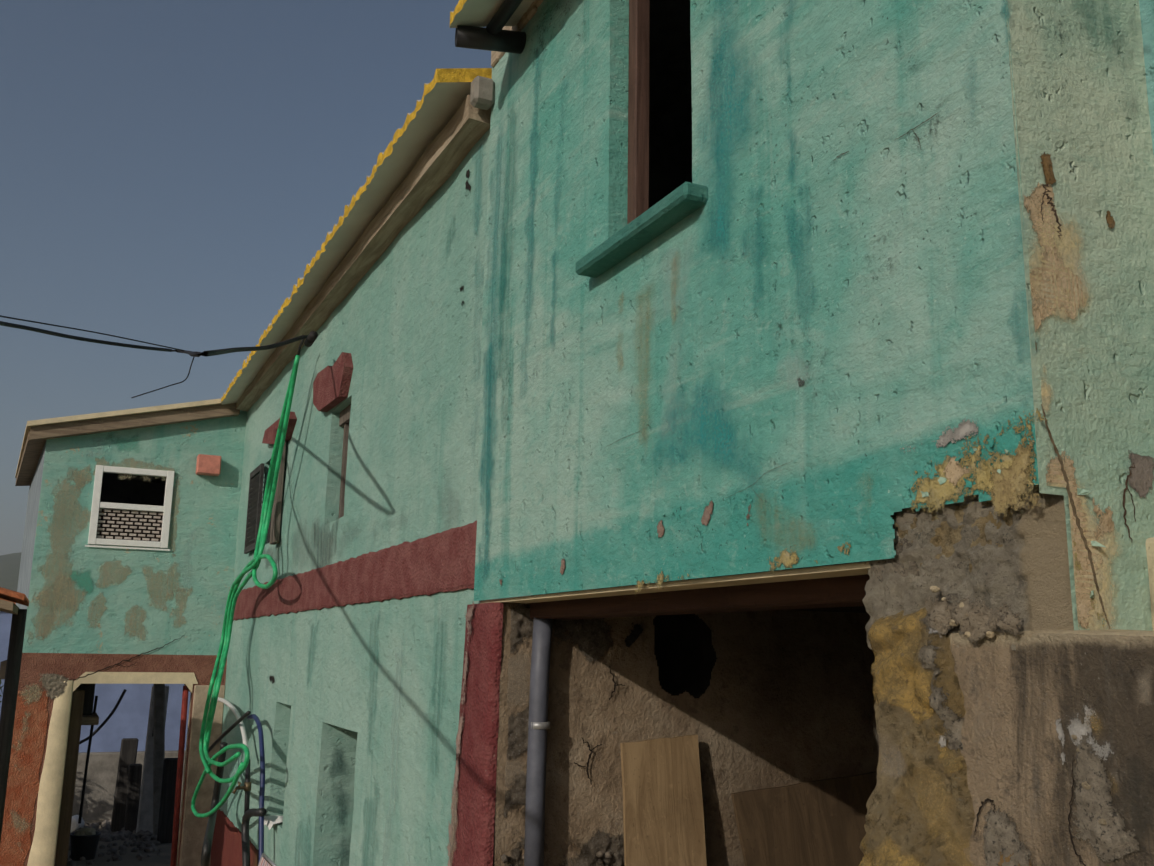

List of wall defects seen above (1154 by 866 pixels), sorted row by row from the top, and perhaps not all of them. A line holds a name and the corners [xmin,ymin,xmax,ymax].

peeling [1023,153,1087,351]
peeling [74,457,192,639]
peeling [767,545,799,572]
peeling [910,408,1114,629]
peeling [1128,453,1154,499]
spalling [552,614,717,698]
spalling [917,586,1022,753]
spalling [501,772,527,866]
spalling [507,700,529,760]
crack [574,737,602,785]
spalling [554,829,625,866]
spalling [1056,705,1140,866]